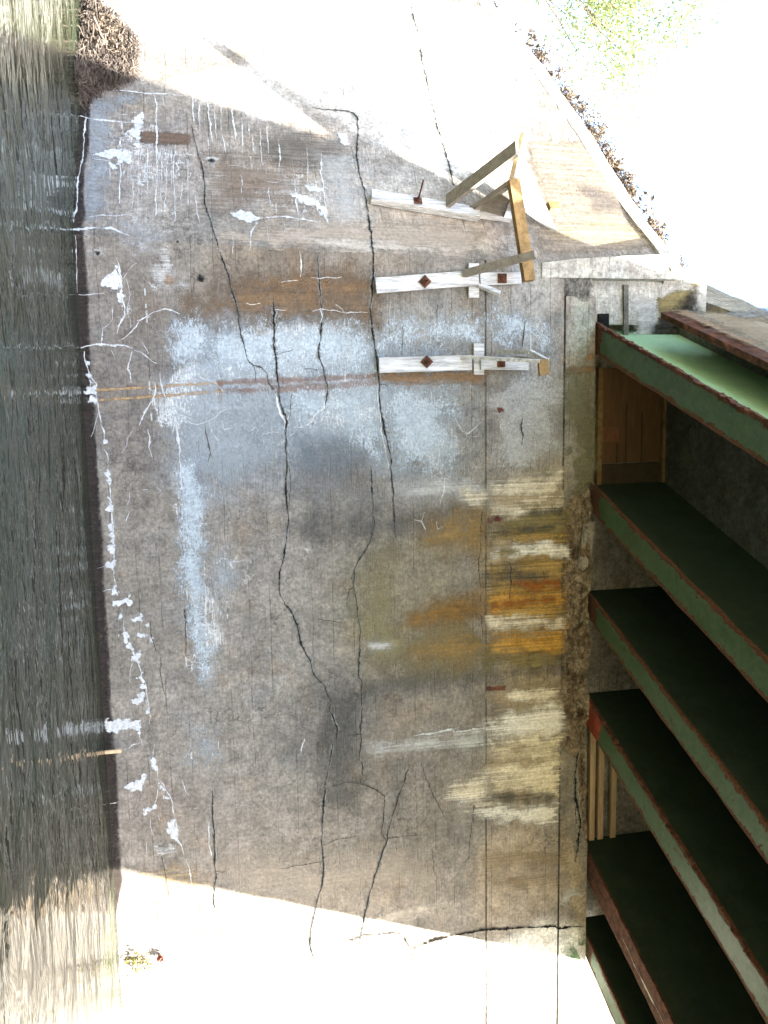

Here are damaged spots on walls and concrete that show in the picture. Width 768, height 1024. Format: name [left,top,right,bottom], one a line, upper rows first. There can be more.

corrosion [96,370,487,401]
crack [191,107,444,959]
water stain [73,90,599,922]
corrosion [358,550,570,668]
spalling [559,472,594,850]
crack [572,751,583,862]